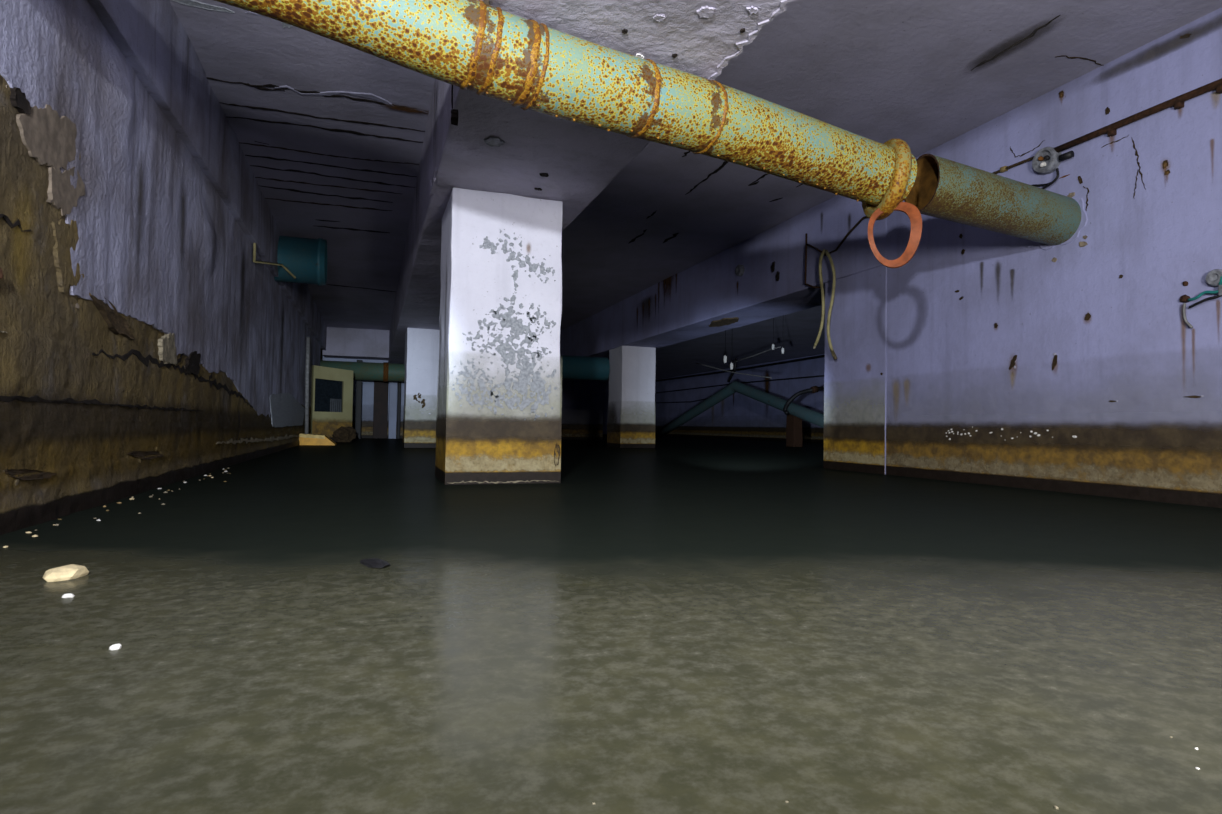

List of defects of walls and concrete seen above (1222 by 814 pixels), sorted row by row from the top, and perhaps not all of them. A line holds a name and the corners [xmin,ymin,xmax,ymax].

peeling [696,6,716,18]
spalling [708,0,796,80]
rust [386,105,429,114]
spalling [0,74,311,513]
peeling [451,229,557,420]
water stain [0,383,786,535]
water stain [802,401,1222,508]